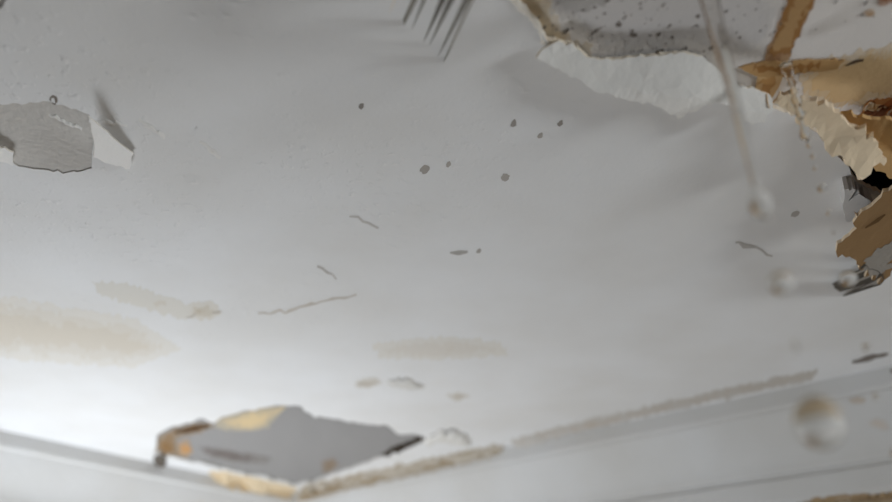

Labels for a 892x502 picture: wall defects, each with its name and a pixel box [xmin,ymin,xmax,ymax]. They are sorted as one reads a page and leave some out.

peeling [403,0,425,28]
peeling [423,0,473,62]
leakage [520,0,714,54]
peeling [536,1,729,119]
leakage [720,0,892,108]
flaking render [0,95,133,173]
peeling [731,0,892,296]
flaking render [153,405,425,500]